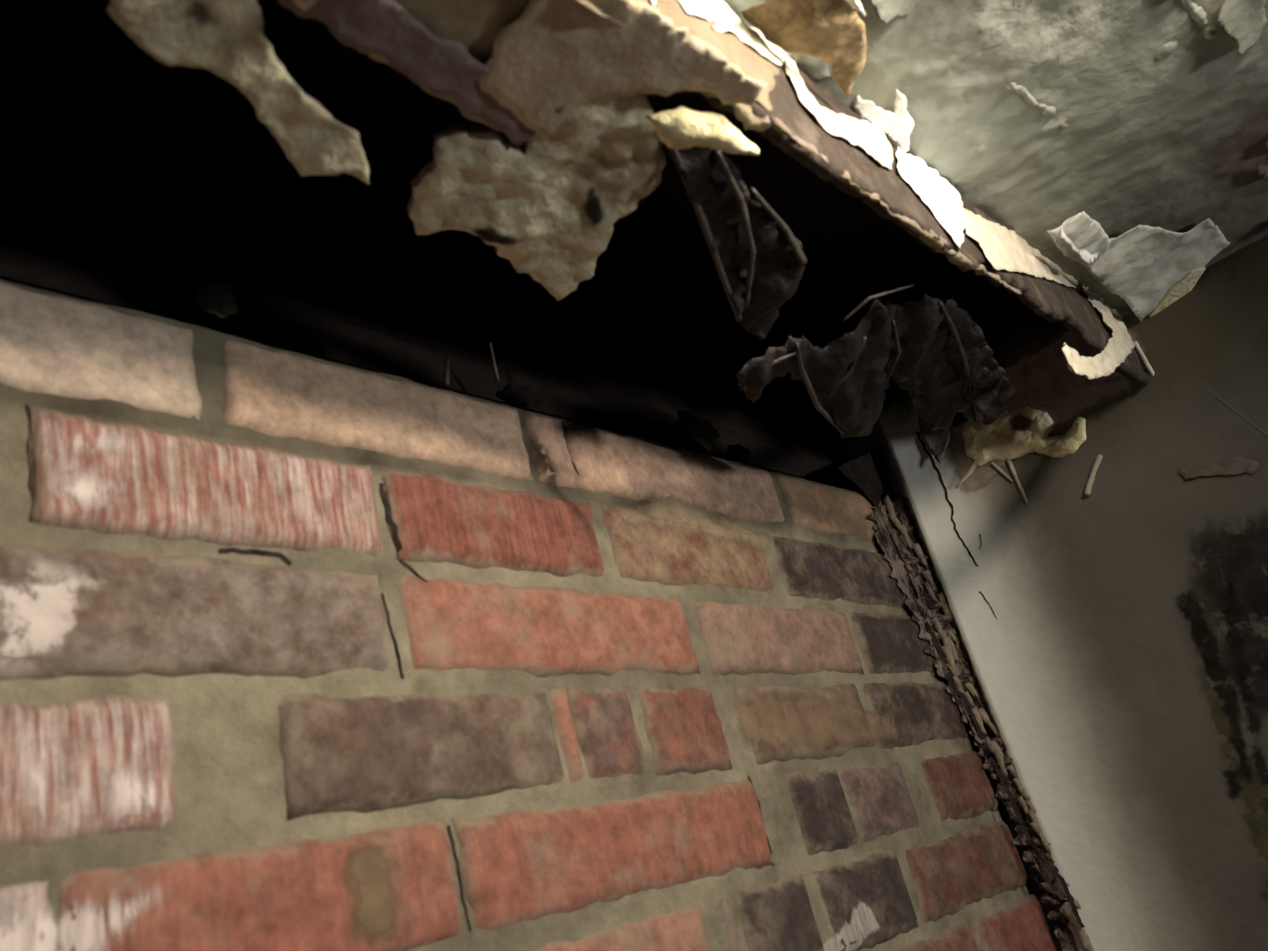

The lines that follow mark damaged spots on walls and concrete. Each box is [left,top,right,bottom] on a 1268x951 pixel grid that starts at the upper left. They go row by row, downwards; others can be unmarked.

peeling [107,0,370,185]
flaking render [479,0,1155,431]
crack [916,431,997,618]
flaking render [917,412,1007,492]
crack [867,468,1094,951]
leakage [1177,522,1268,860]
crack [447,825,472,931]